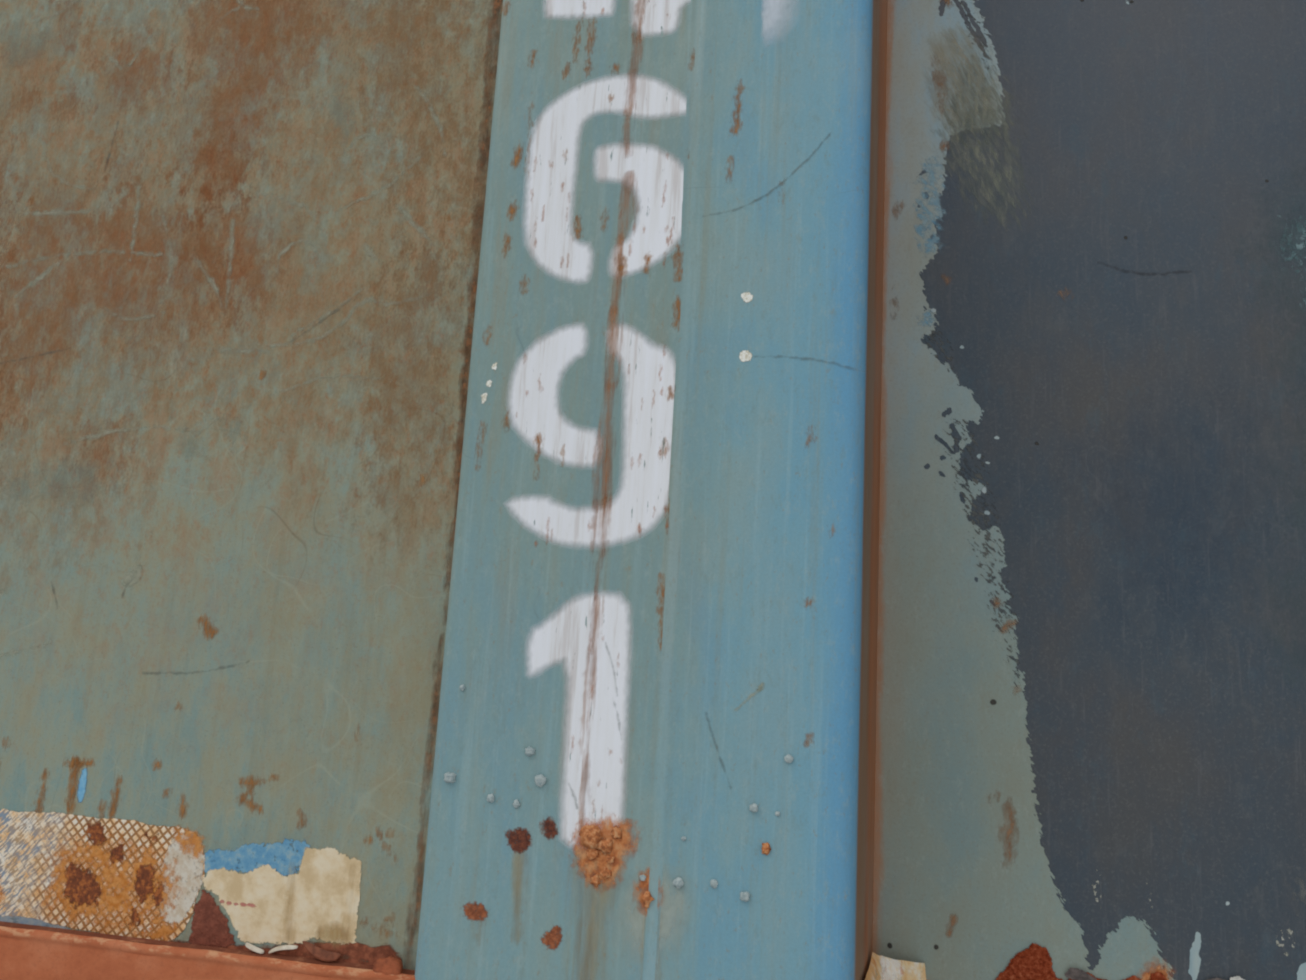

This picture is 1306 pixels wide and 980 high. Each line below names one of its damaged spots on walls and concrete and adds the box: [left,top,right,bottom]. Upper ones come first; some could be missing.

corrosion [479,0,508,170]
corrosion [449,273,488,581]
peeling [945,419,1020,687]
corrosion [432,682,440,732]
corrosion [67,758,93,812]
corrosion [44,776,402,965]
peeling [204,839,310,876]
corrosion [505,817,558,853]
corrosion [574,819,634,884]
corrosion [636,870,650,914]
peeling [996,943,1106,980]
peeling [1125,966,1169,980]